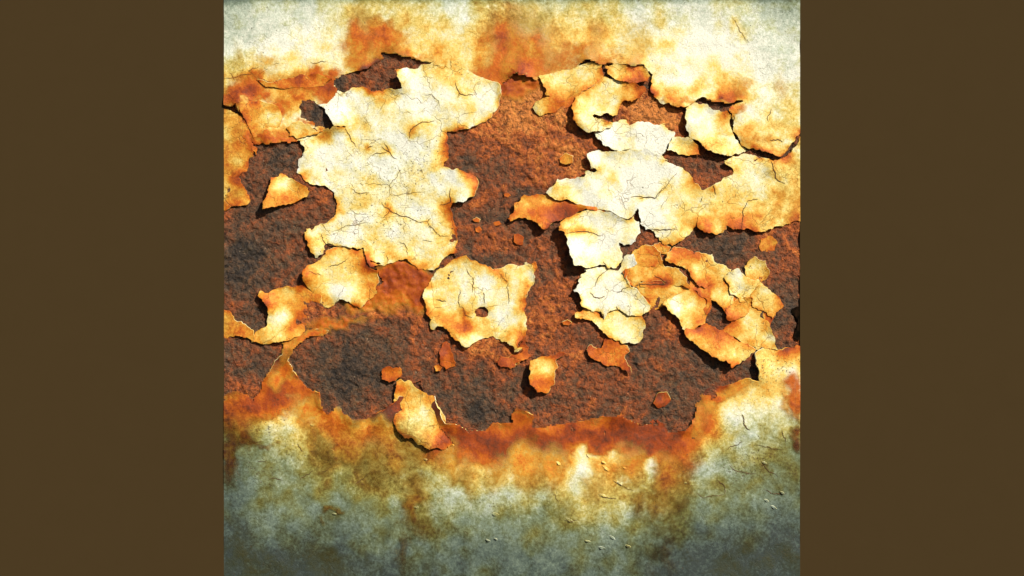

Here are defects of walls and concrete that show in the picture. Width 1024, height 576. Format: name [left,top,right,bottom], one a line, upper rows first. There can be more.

crack [309,86,471,274]
peeling [224,59,565,394]
corrosion [223,4,800,535]
peeling [507,61,800,373]
crack [633,173,678,231]
peeling [381,366,454,460]
peeling [653,392,671,408]